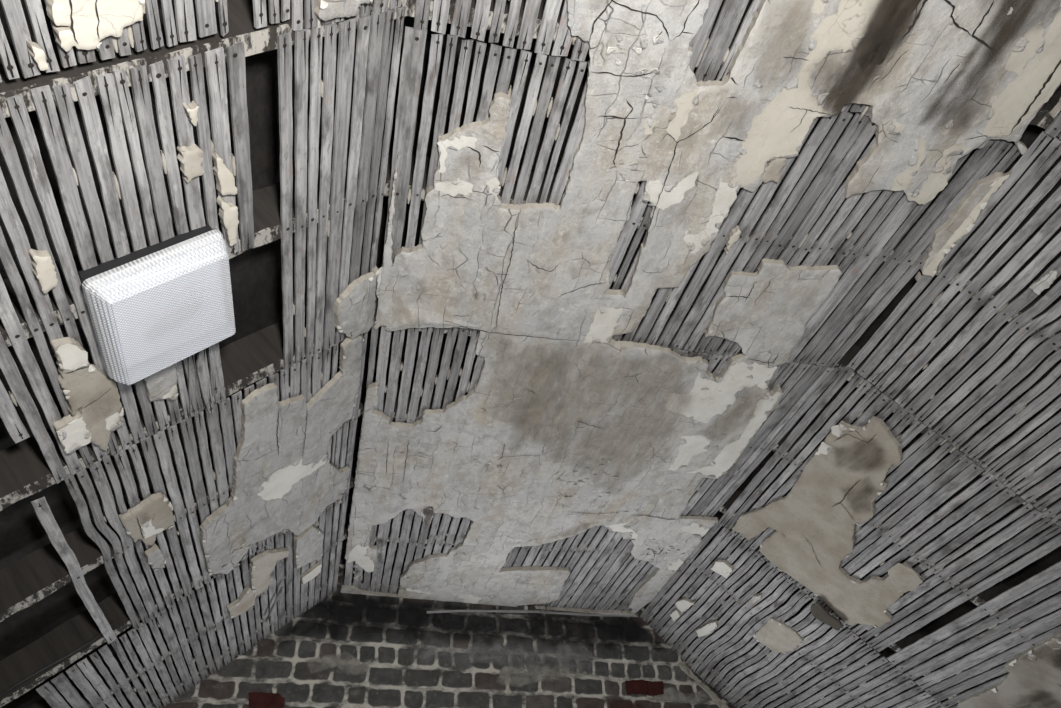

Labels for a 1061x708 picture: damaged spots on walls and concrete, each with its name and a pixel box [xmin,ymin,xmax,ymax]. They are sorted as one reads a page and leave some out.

crack [589,0,700,42]
water stain [827,0,912,113]
crack [878,0,995,83]
water stain [976,0,1035,85]
crack [593,69,656,167]
crack [643,78,744,247]
spalling [0,0,589,708]
spalling [503,0,1061,708]